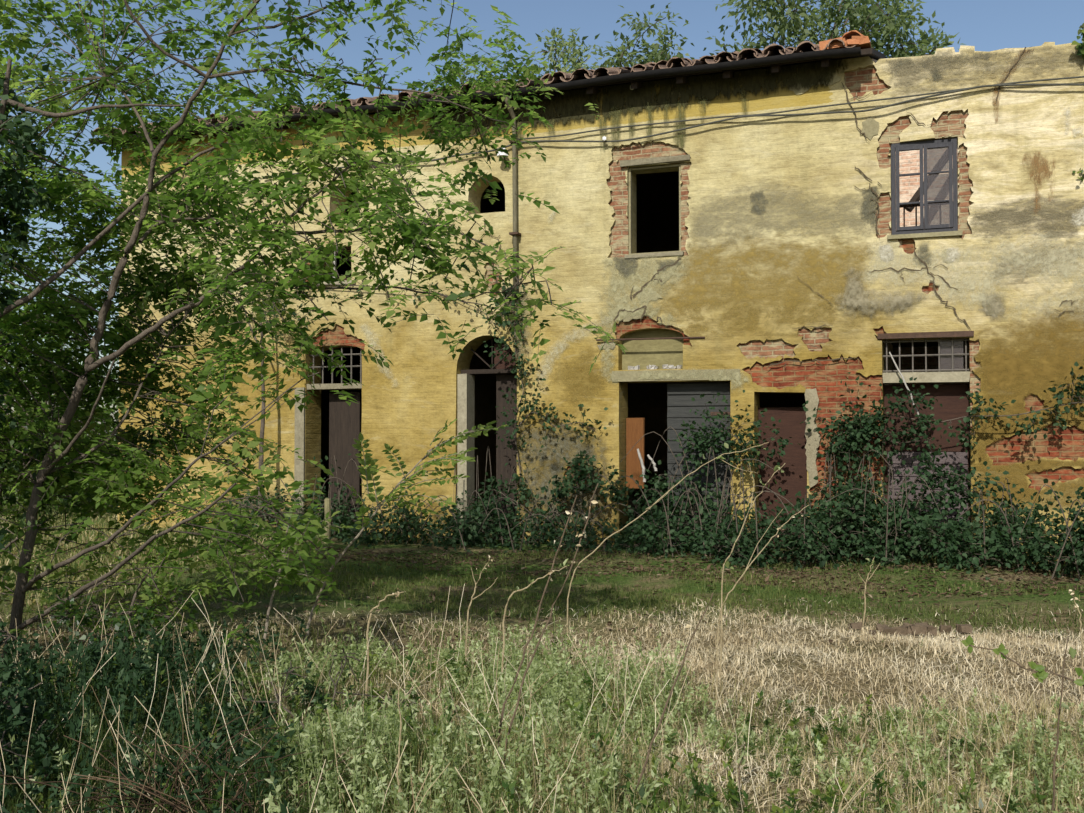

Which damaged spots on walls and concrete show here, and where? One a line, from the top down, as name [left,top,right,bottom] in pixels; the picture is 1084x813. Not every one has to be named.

leakage [428,59,847,149]
flaking render [607,141,692,285]
flaking render [790,66,891,101]
flaking render [877,116,911,169]
flaking render [931,110,973,240]
leakage [973,196,1084,282]
flaking render [597,306,692,350]
crack [613,258,681,322]
crack [872,250,971,330]
flaking render [737,326,883,519]
leakage [971,293,1084,509]
flaking render [985,422,1084,494]